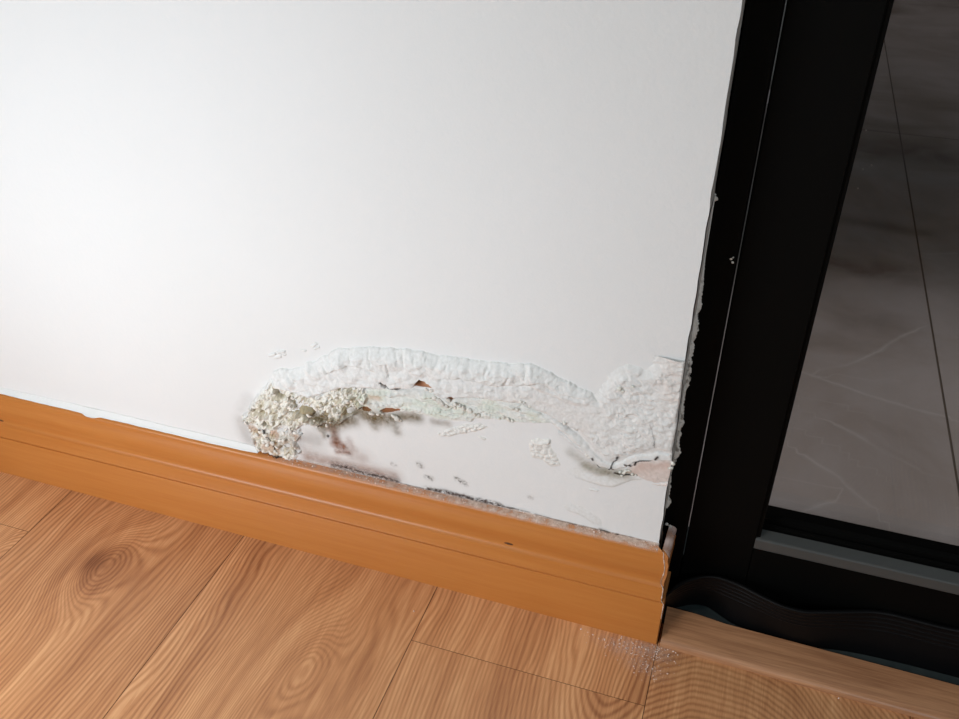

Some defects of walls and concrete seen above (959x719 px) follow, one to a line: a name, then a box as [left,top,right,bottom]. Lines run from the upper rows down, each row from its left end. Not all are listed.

spalling [352,380,551,440]
spalling [614,193,718,530]